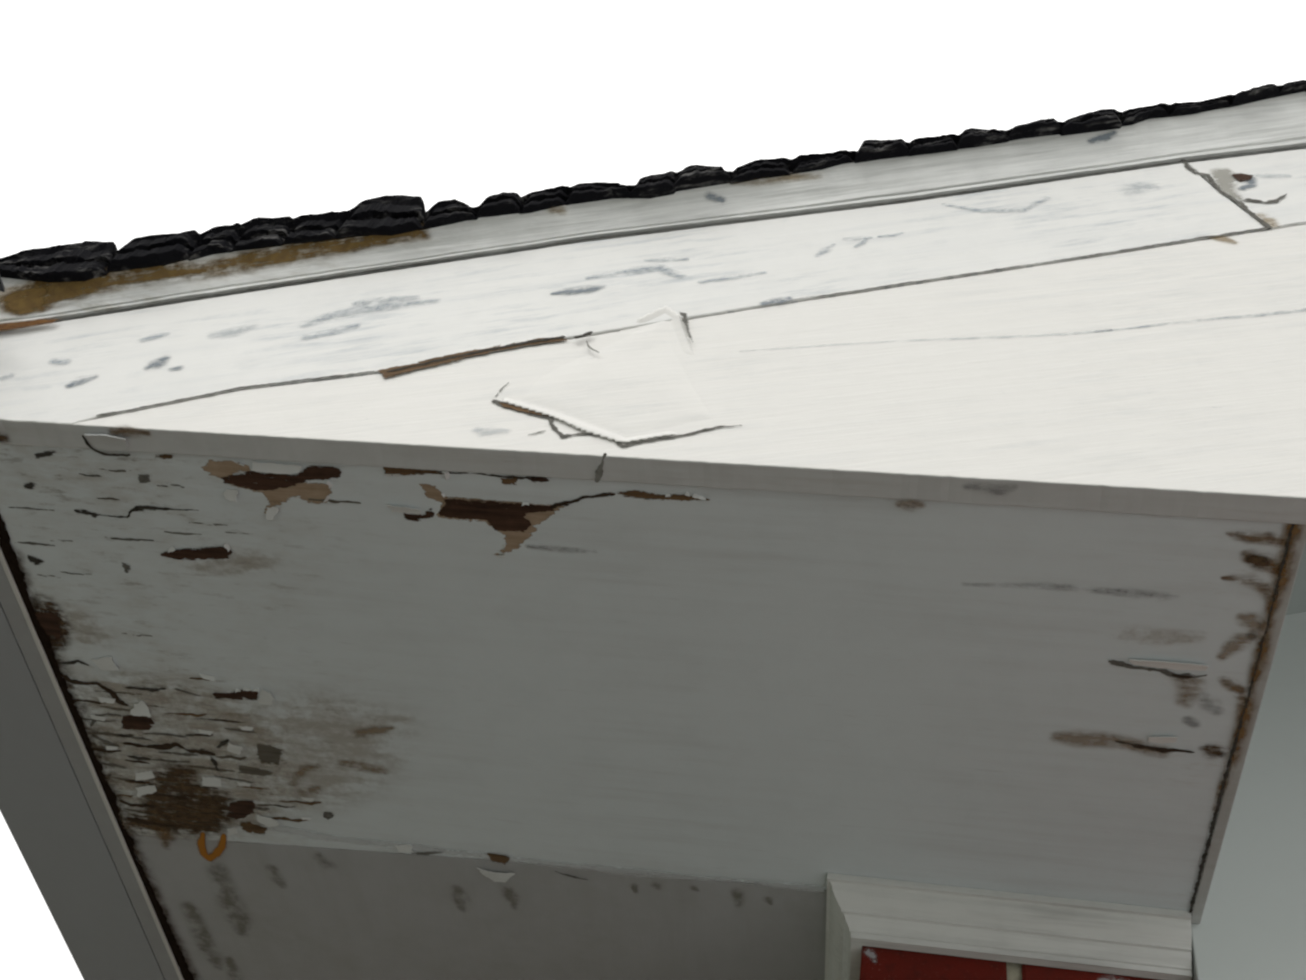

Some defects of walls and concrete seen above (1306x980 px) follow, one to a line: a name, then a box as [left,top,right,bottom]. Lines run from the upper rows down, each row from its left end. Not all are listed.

crack [792,159,1303,300]
crack [574,331,599,353]
crack [82,371,374,457]
peeling [79,469,184,488]
peeling [111,522,246,562]
peeling [201,460,361,520]
peeling [383,467,710,558]
peeling [189,674,275,705]
water stain [17,558,196,980]
peeling [73,690,334,827]